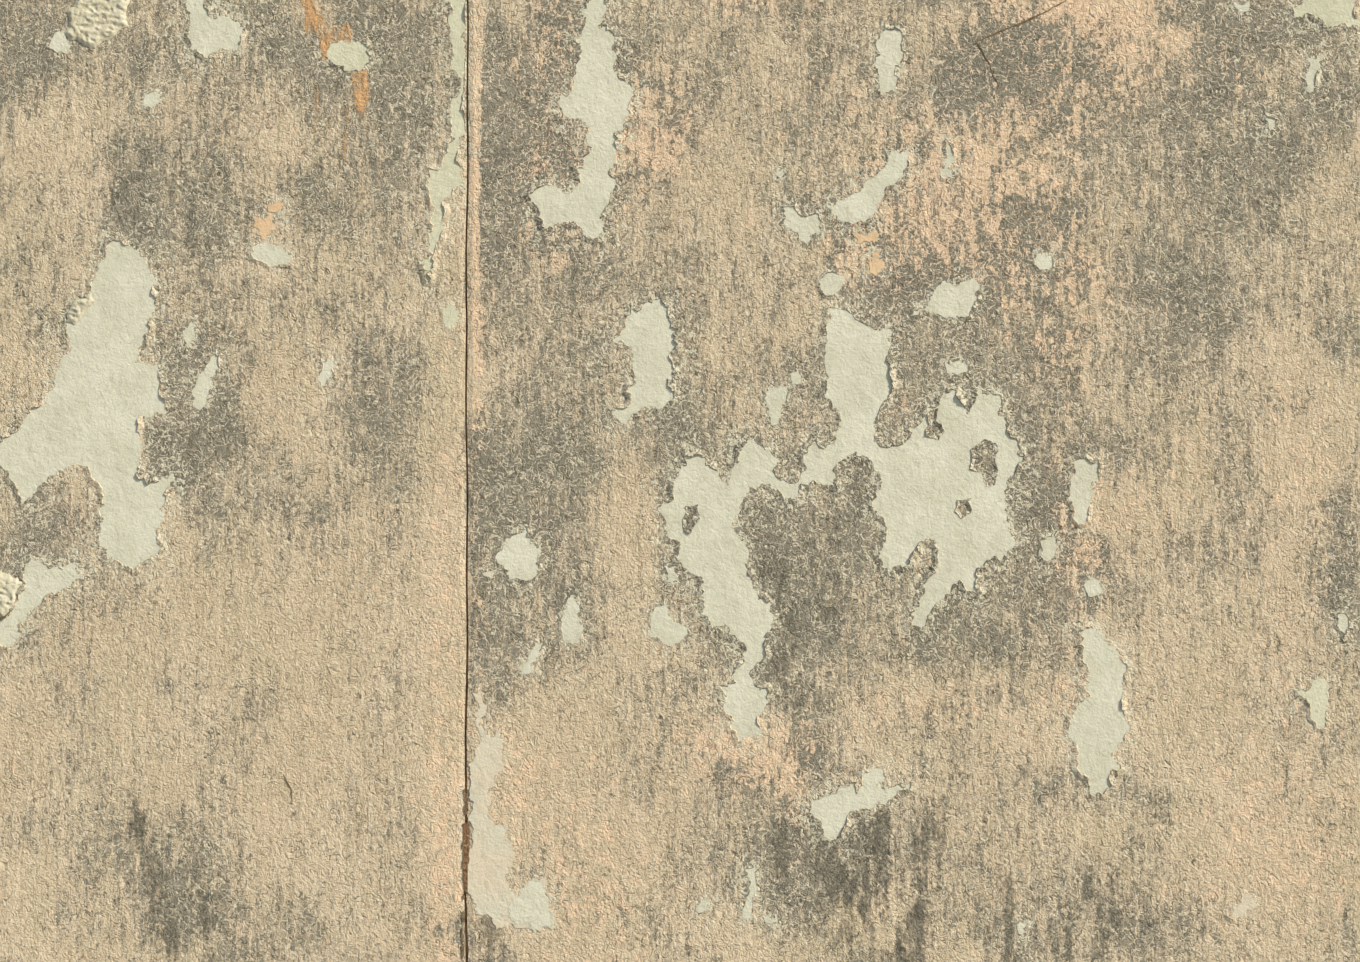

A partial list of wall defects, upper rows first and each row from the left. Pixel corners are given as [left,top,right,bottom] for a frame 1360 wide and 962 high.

rust [301,0,351,58]
rust [345,69,369,114]
peeling [523,0,640,245]
peeling [0,234,180,576]
peeling [606,292,684,430]
peeling [643,268,1061,748]
peeling [0,551,86,653]
leakage [131,813,179,959]
peeling [468,691,556,932]
leakage [815,810,890,931]
peeling [803,762,917,845]
leakage [897,878,933,962]